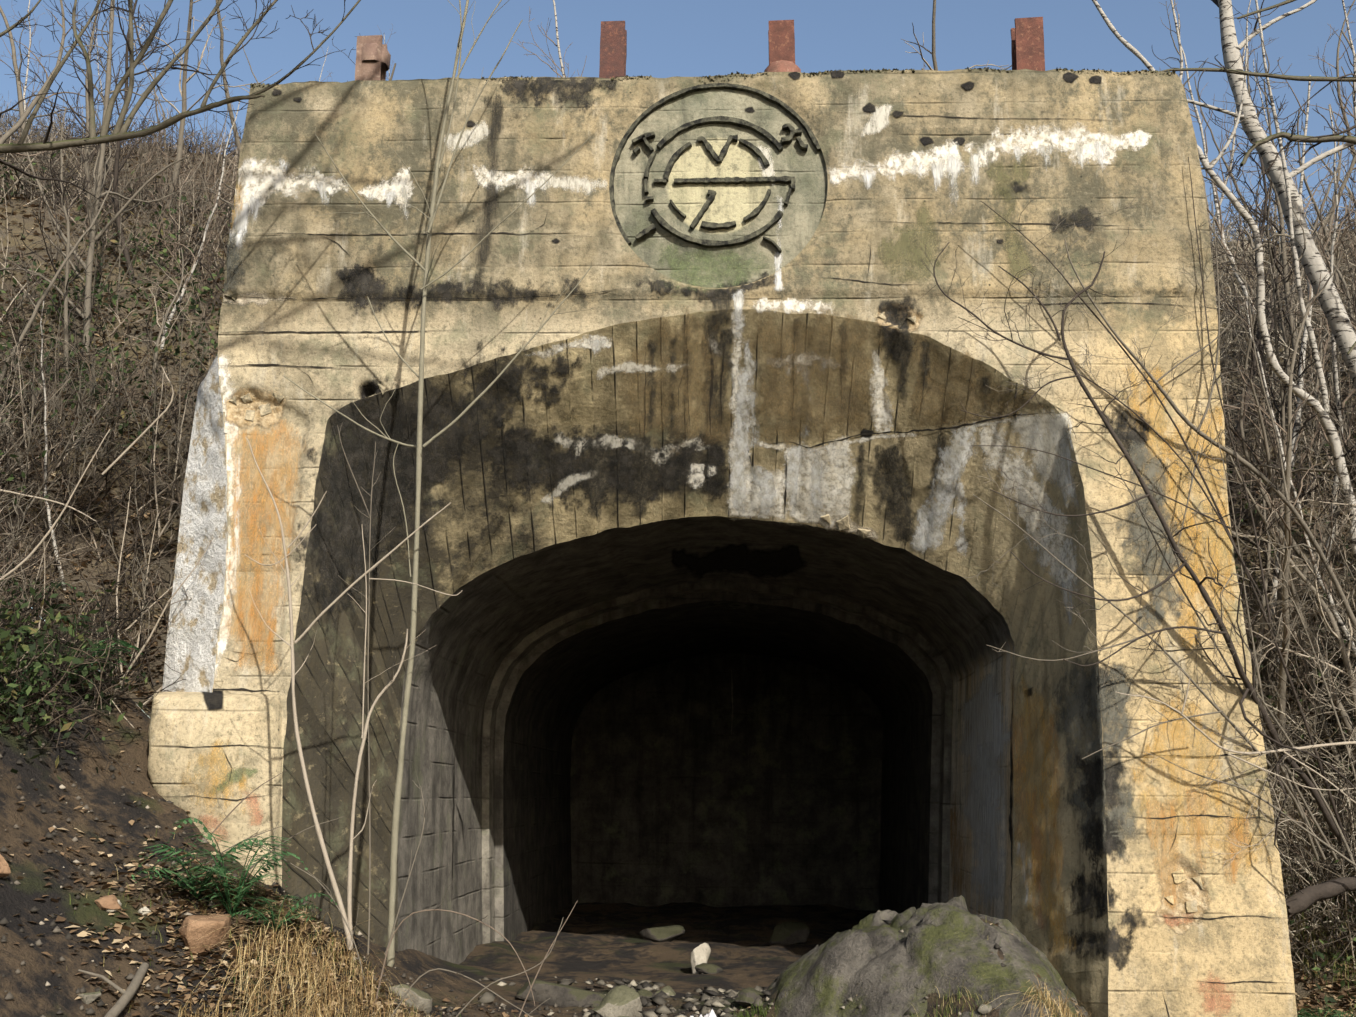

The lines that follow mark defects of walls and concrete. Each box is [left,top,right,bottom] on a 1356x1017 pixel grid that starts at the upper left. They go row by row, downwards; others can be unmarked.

damp [224,159,412,292]
damp [335,95,606,314]
damp [830,126,1151,187]
damp [1050,205,1100,231]
damp [538,252,1078,624]
crack [678,315,1065,518]
rust [227,421,300,673]
spalling [203,681,224,710]
damp [1055,661,1147,970]
rust [1133,703,1261,905]